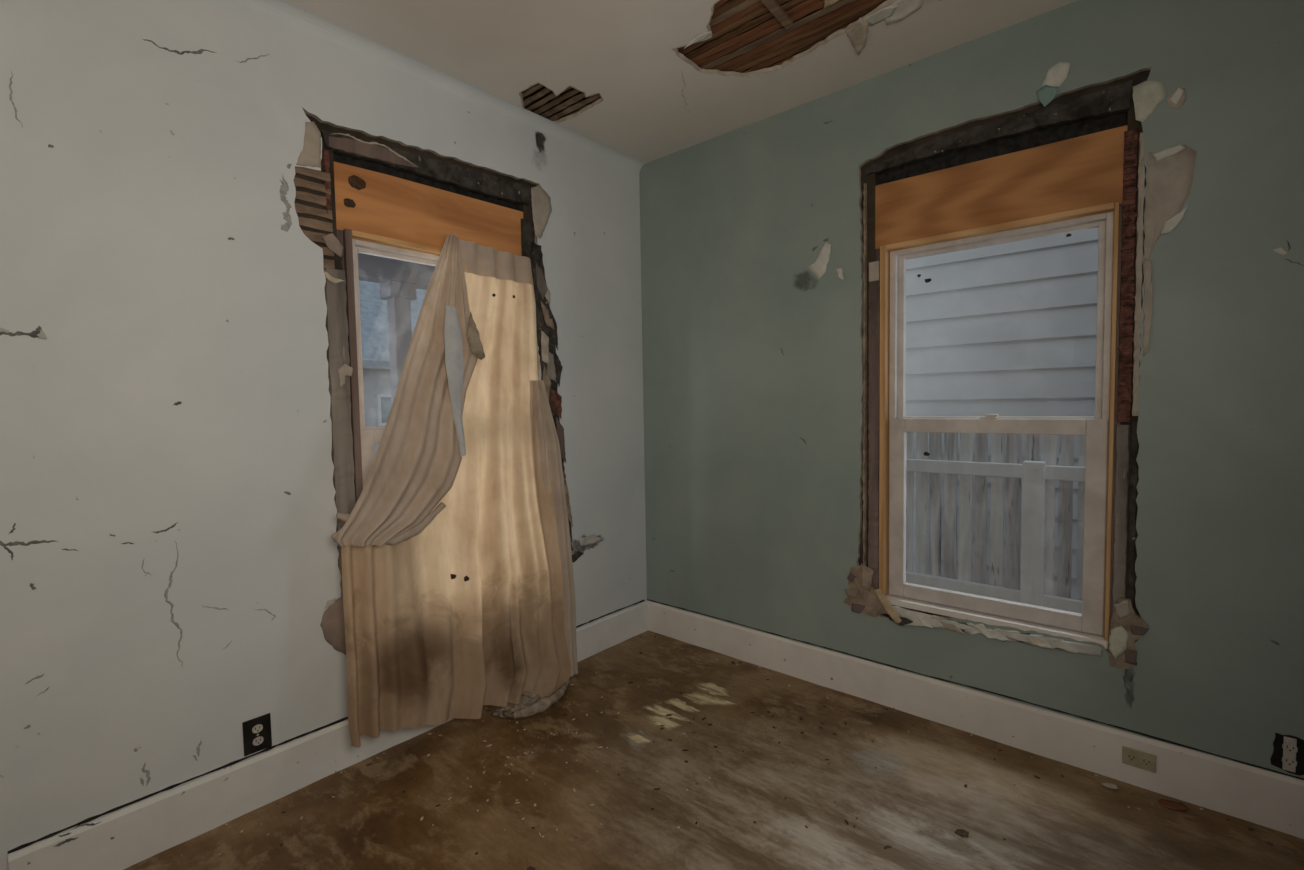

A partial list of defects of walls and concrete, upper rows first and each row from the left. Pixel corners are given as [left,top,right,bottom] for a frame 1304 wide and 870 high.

crack [143,39,271,63]
flaking render [672,0,924,77]
crack [9,72,23,128]
flaking render [519,82,603,124]
peeling [1036,62,1071,107]
peeling [1133,81,1186,122]
flaking render [279,122,344,284]
peeling [796,238,844,288]
crack [0,326,47,339]
crack [0,523,78,560]
crack [109,522,276,667]
flaking render [843,563,886,617]